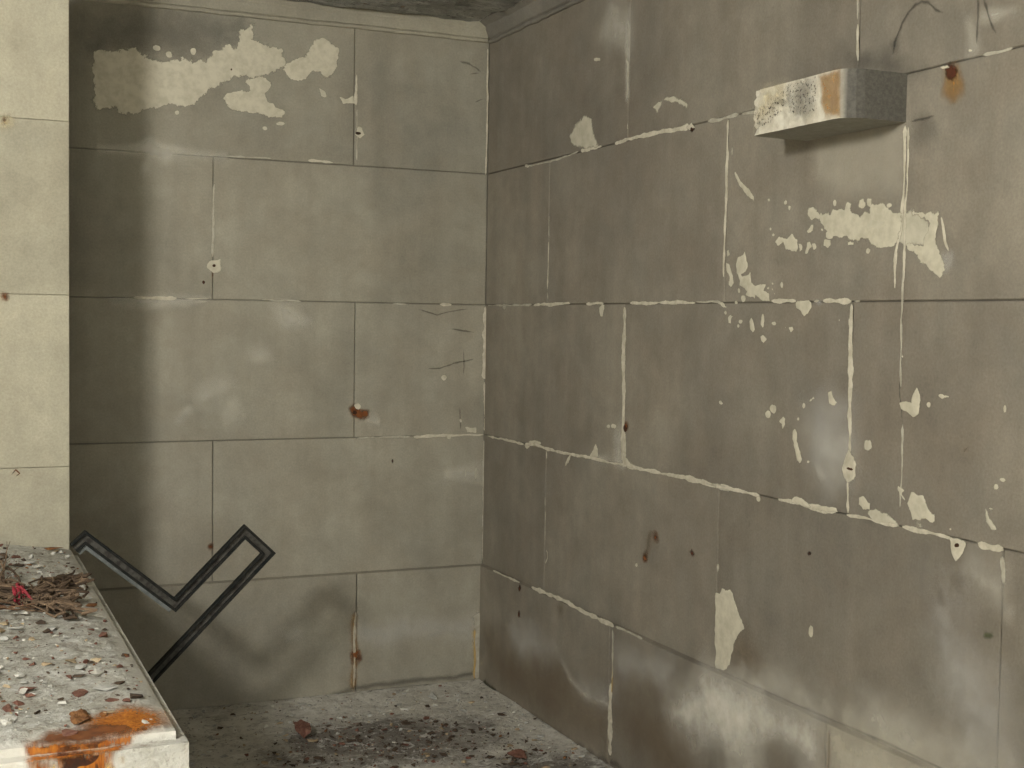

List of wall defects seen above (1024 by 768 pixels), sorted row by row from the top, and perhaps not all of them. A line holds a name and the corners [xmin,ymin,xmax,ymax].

flaking render [92,24,339,130]
corrosion [821,72,839,114]
corrosion [940,63,961,98]
flaking render [569,116,598,149]
flaking render [770,198,949,278]
flaking render [720,250,794,343]
corrosion [349,403,368,419]
flaking render [899,388,949,417]
flaking render [897,486,935,527]
flaking render [715,588,744,670]
corrosion [26,707,167,768]